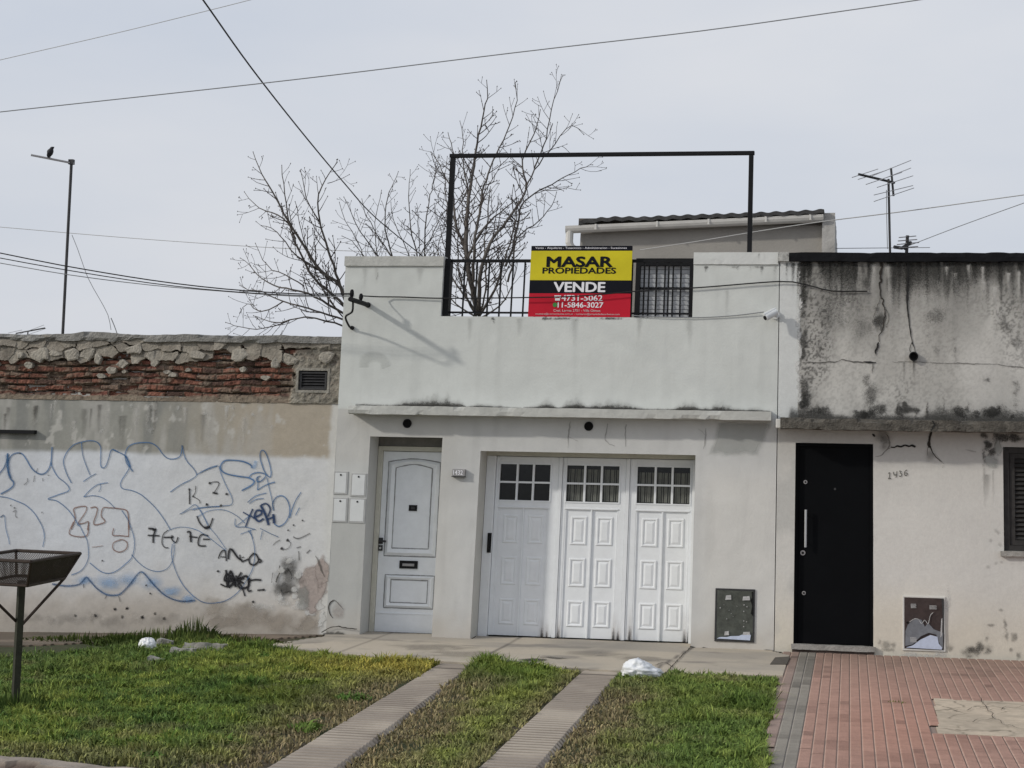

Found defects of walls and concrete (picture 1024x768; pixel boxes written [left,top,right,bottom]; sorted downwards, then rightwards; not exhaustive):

crack [803,262,891,374]
leakage [786,262,1024,366]
crack [876,421,944,464]
flaking render [292,557,355,636]